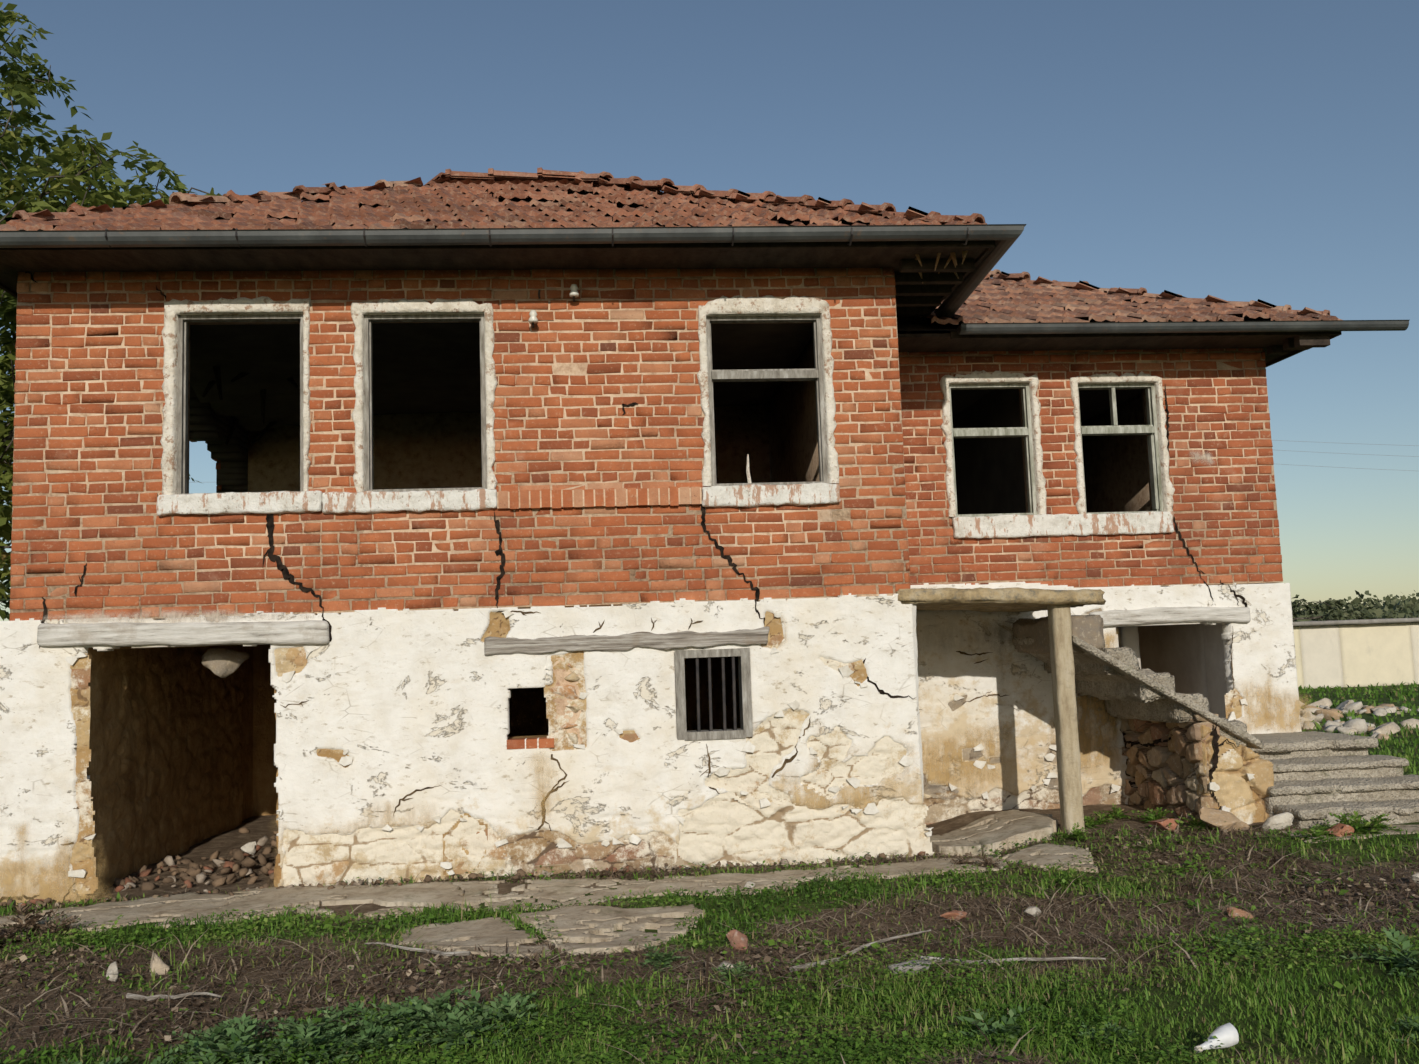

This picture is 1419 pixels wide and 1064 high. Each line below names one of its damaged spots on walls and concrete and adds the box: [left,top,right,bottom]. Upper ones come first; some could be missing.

crack [263,491,332,642]
flaking render [481,610,513,642]
crack [494,512,539,615]
crack [700,504,765,649]
crack [1164,385,1247,689]
flaking render [544,651,588,751]
crack [863,658,922,710]
crack [393,785,440,816]
crack [535,754,568,831]
flaking render [281,700,1060,886]
flaking render [1082,784,1127,806]